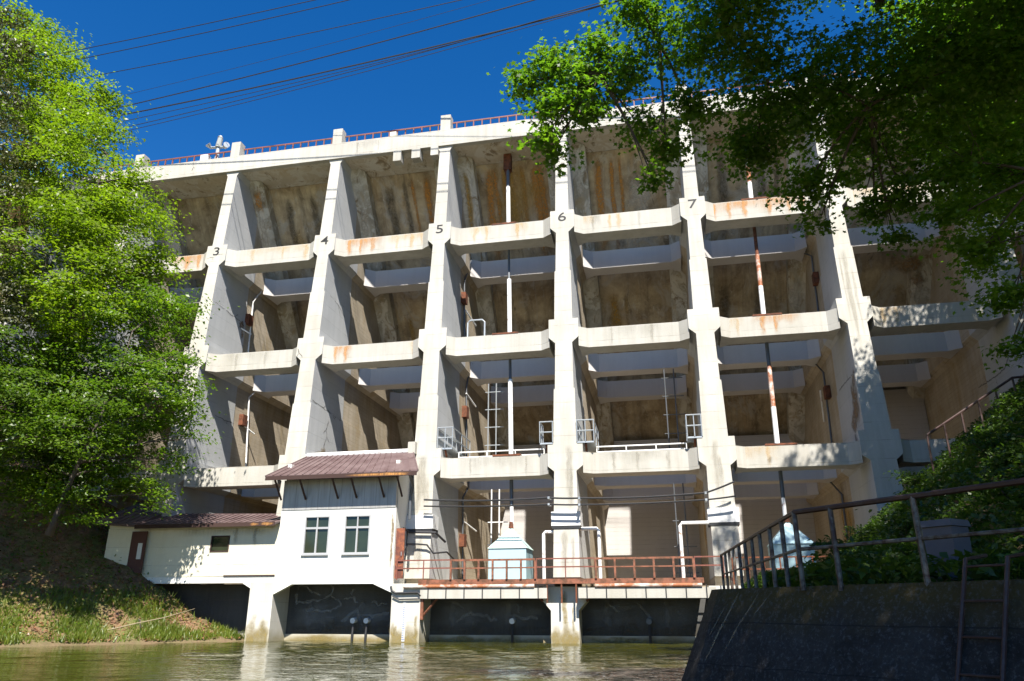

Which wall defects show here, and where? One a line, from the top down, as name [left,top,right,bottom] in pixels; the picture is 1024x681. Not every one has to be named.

damp [388,181,434,235]
damp [486,168,555,225]
damp [595,162,649,215]